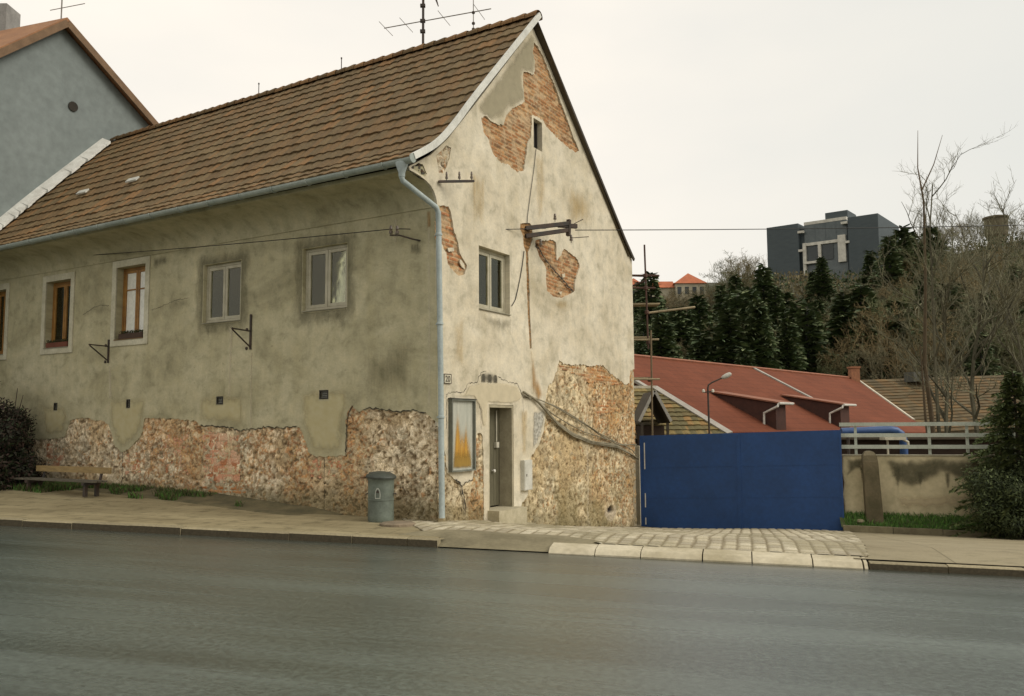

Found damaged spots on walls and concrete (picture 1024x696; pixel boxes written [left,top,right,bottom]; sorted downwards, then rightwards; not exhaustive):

spalling [481,44,578,172]
spalling [435,206,466,276]
spalling [535,239,578,298]
spalling [25,406,484,522]
spalling [521,361,637,527]
damp [890,460,998,484]